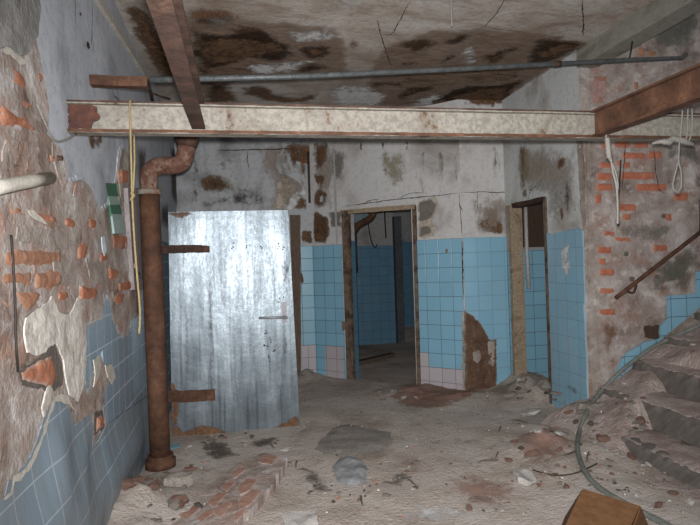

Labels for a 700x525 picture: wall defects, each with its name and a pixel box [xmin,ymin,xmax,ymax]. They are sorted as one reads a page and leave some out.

water stain [127,6,173,77]
water stain [186,18,347,103]
crack [377,1,411,69]
water stain [368,28,579,106]
corrosion [68,104,102,147]
spalling [0,38,142,500]
spalling [302,212,329,243]
crack [348,191,502,295]
water stain [475,200,505,230]
spalling [576,141,695,339]
spalling [462,310,497,390]
corrosion [172,402,224,436]